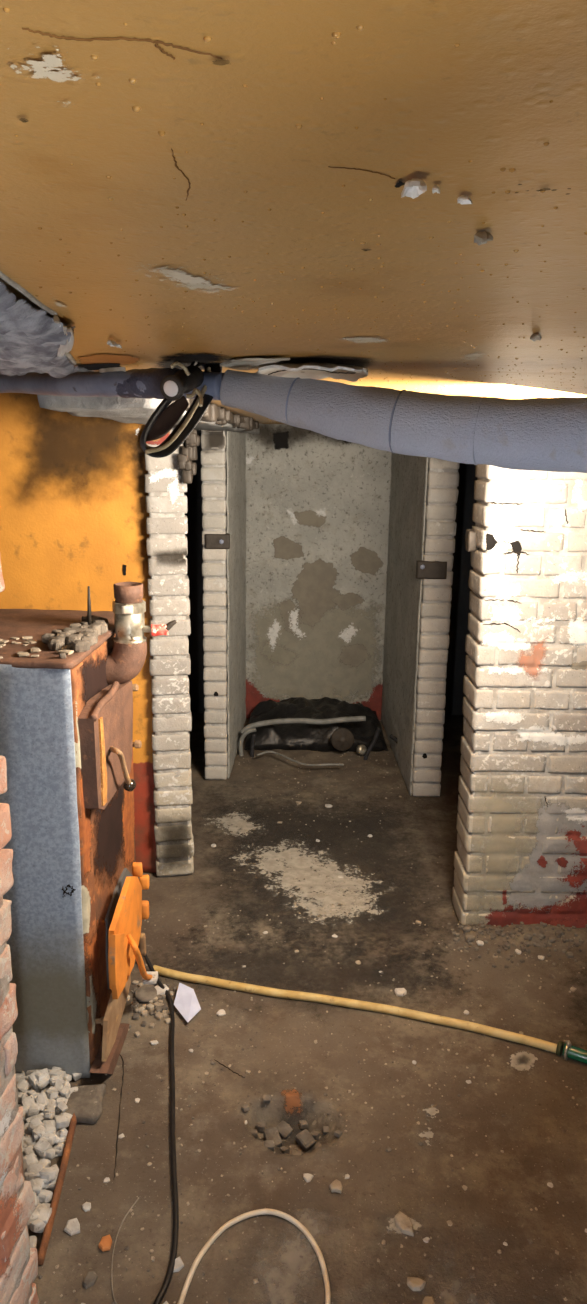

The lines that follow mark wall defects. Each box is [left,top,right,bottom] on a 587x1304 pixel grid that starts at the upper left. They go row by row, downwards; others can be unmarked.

crack [22,28,230,65]
crack [171,149,191,200]
flaking render [0,271,140,378]
flaking render [294,510,327,528]
flaking render [273,536,304,560]
flaking render [350,547,383,575]
peeling [482,512,587,677]